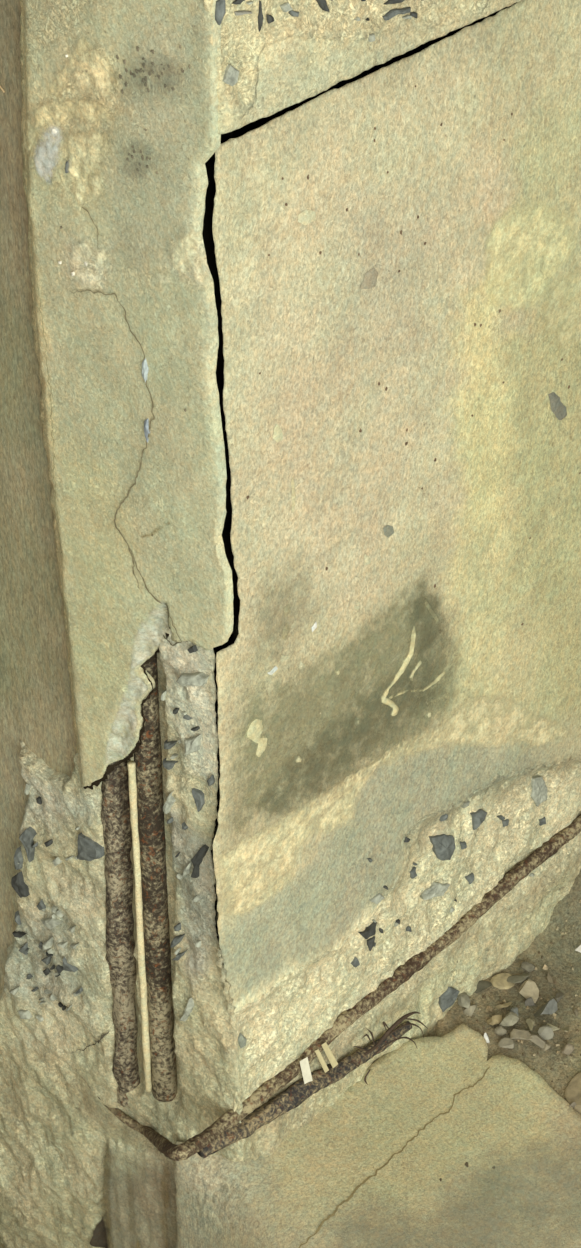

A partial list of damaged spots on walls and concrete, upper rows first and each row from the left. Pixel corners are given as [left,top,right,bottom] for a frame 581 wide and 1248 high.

spalling [0,623,581,1248]
crack [70,2,517,942]
leakage [235,587,452,831]
crack [299,1066,490,1248]